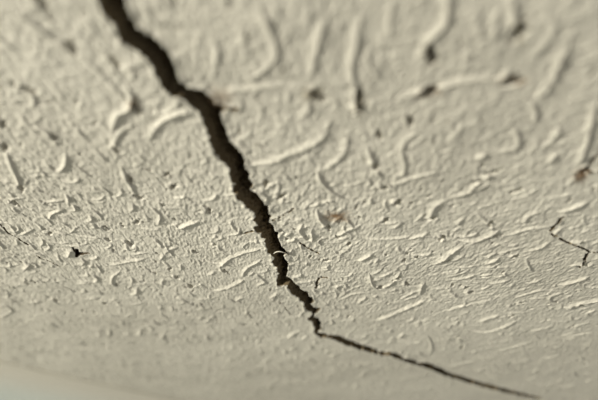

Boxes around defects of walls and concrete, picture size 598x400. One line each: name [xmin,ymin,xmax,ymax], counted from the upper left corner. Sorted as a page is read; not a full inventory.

crack [98,0,541,399]
crack [549,216,598,268]